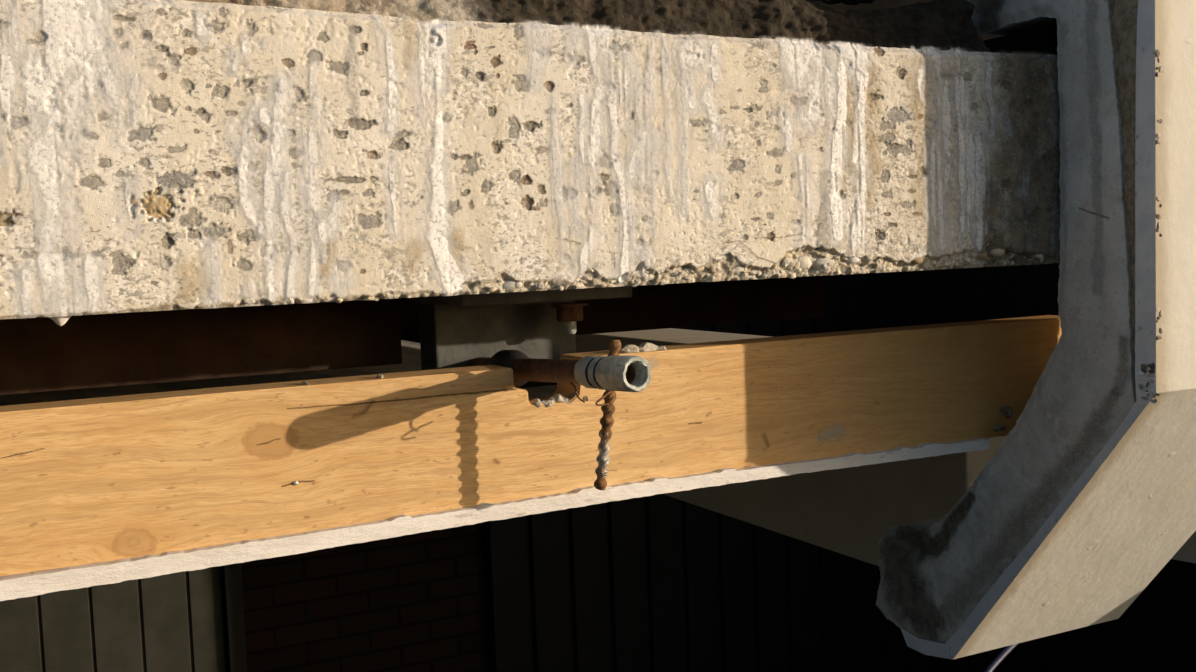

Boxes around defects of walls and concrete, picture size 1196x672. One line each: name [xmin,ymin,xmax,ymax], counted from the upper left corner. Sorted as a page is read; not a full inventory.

water stain [0,0,142,326]
water stain [196,11,210,43]
water stain [203,68,352,309]
water stain [374,14,398,136]
water stain [410,19,469,296]
water stain [525,22,552,92]
spalling [70,212,1055,316]
water stain [550,26,724,287]
water stain [770,38,873,253]
water stain [912,47,1032,256]